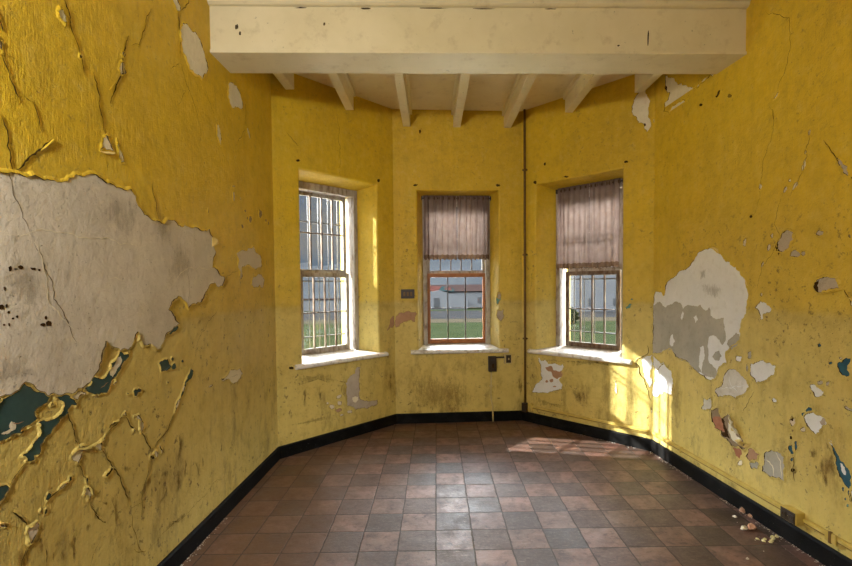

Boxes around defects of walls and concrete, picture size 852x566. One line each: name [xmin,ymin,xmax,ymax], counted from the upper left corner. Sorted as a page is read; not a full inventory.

crack [2,99,54,171]
crack [94,12,151,155]
peeling [172,0,209,122]
peeling [227,80,243,111]
peeling [631,89,655,133]
peeling [664,74,715,114]
peeling [236,245,265,289]
flaking render [0,164,225,566]
flaking render [326,366,378,417]
flaking render [530,356,565,394]
flaking render [652,246,852,508]